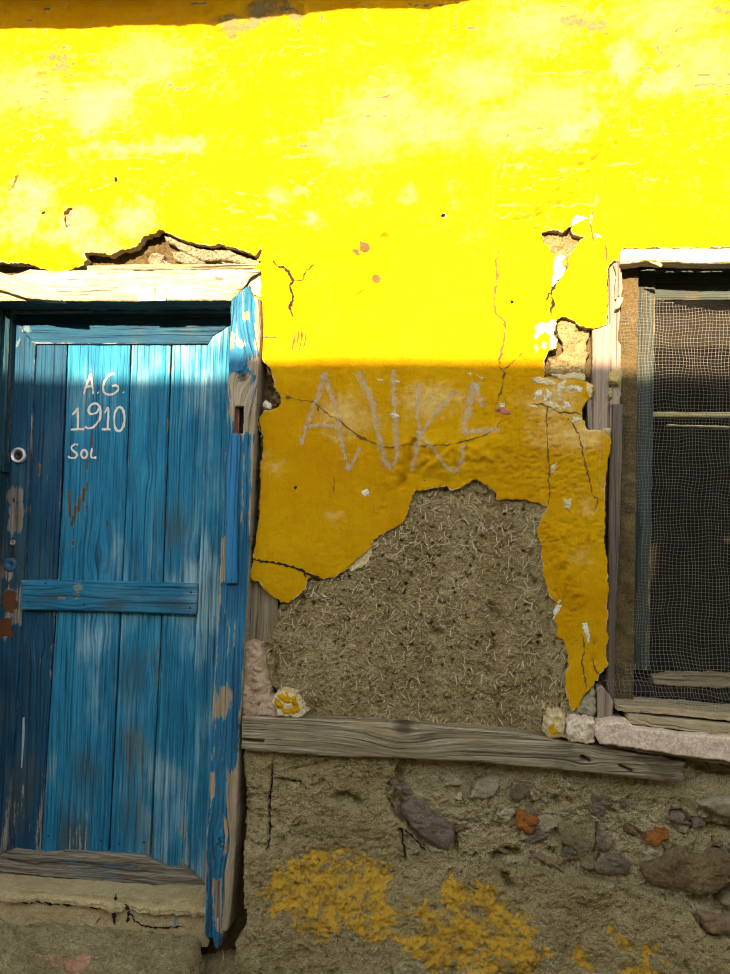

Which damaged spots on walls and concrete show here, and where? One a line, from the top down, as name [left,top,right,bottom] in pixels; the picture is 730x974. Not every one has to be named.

spalling [89,236,262,297]
crack [273,260,317,316]
spalling [542,214,602,286]
crack [285,247,522,448]
spalling [527,318,594,423]
spalling [264,480,586,733]
flaking render [387,758,730,937]